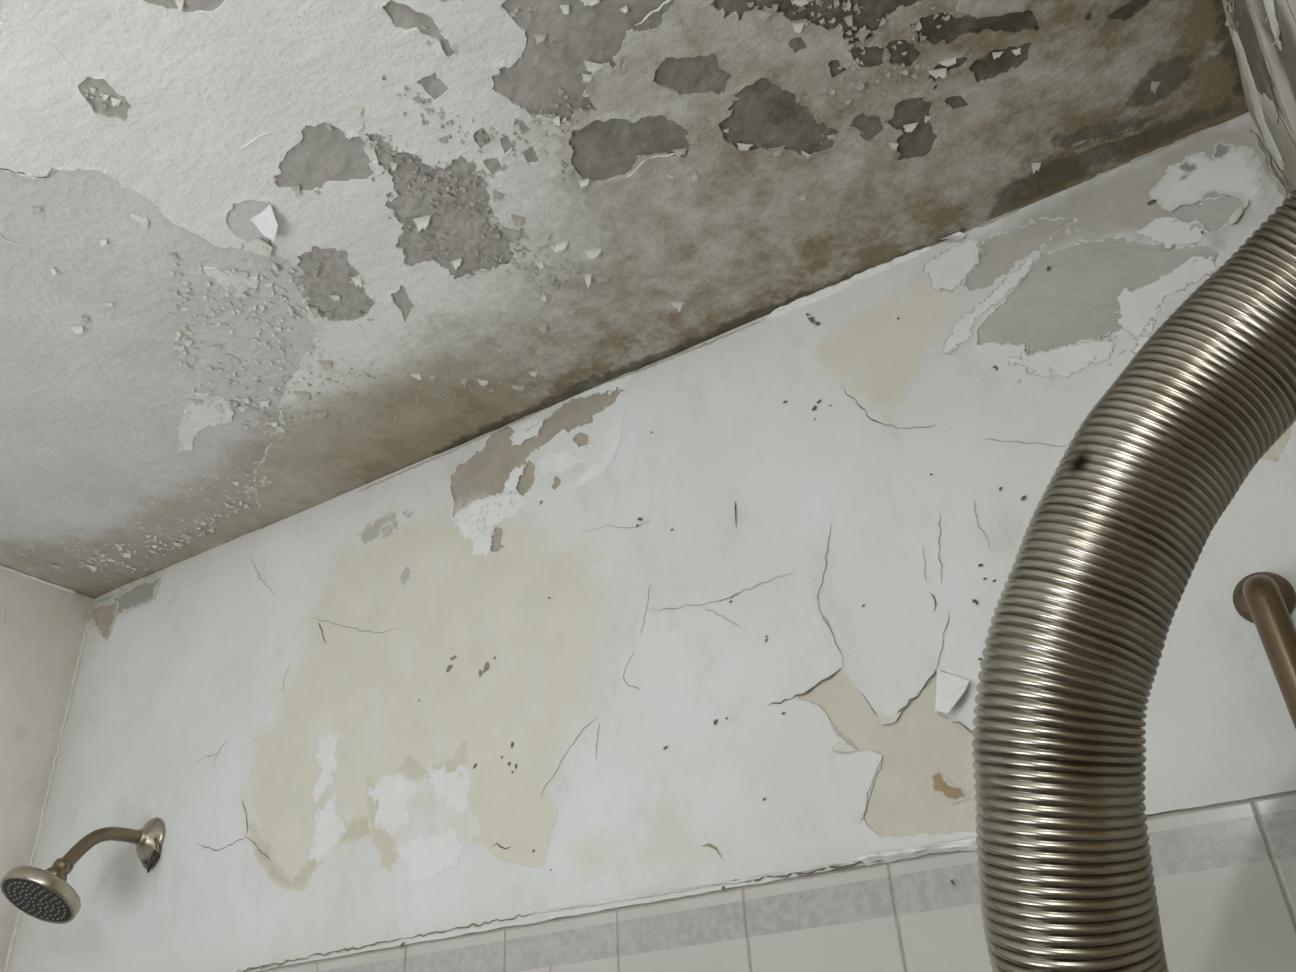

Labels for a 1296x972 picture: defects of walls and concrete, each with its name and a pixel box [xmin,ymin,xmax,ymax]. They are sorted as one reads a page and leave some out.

peeling [78,77,131,121]
peeling [272,0,690,302]
peeling [653,0,1039,171]
peeling [0,167,538,642]
damp [0,0,1296,727]
peeling [356,195,1248,557]
damp [235,487,722,903]
crack [622,573,791,690]
crack [767,522,845,706]
peeling [798,668,978,866]
crack [862,512,949,717]
crack [953,720,972,733]